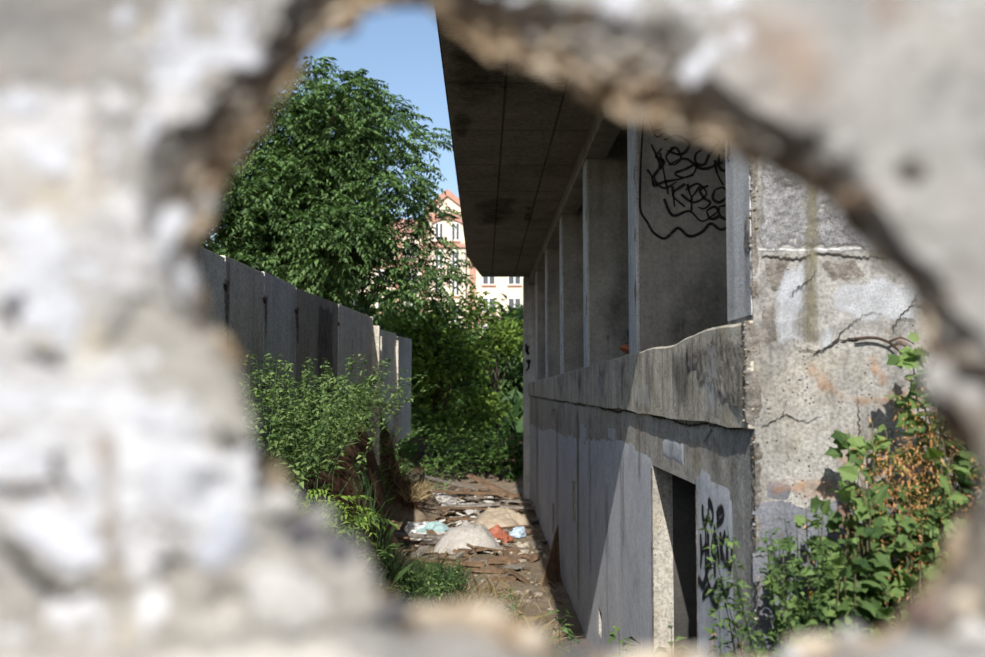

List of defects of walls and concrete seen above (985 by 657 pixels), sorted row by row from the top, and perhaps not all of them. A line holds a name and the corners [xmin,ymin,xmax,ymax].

spalling [505,0,645,80]
spalling [602,25,752,145]
peeling [0,0,445,657]
crack [794,300,916,356]
peeling [663,438,684,466]
peeling [685,149,925,657]
peeling [467,424,673,657]